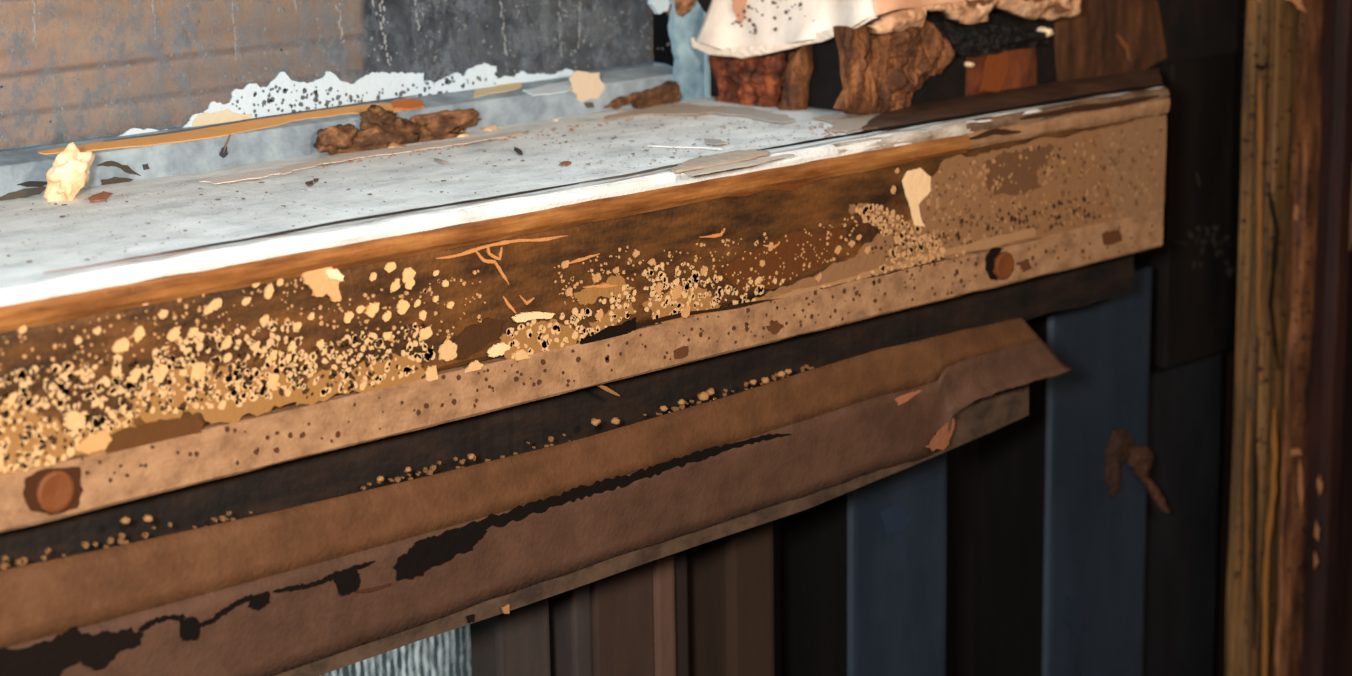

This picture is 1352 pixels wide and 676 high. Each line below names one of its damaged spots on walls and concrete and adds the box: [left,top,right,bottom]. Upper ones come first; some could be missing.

peeling [648,0,670,14]
spalling [866,0,1081,35]
peeling [522,71,605,108]
rust [985,247,1003,281]
peeling [142,298,222,341]
peeling [241,262,531,389]
peeling [511,311,555,323]
peeling [110,326,169,383]
peeling [65,410,112,454]
rust [23,466,83,515]
peeling [393,530,487,581]
peeling [0,626,143,676]